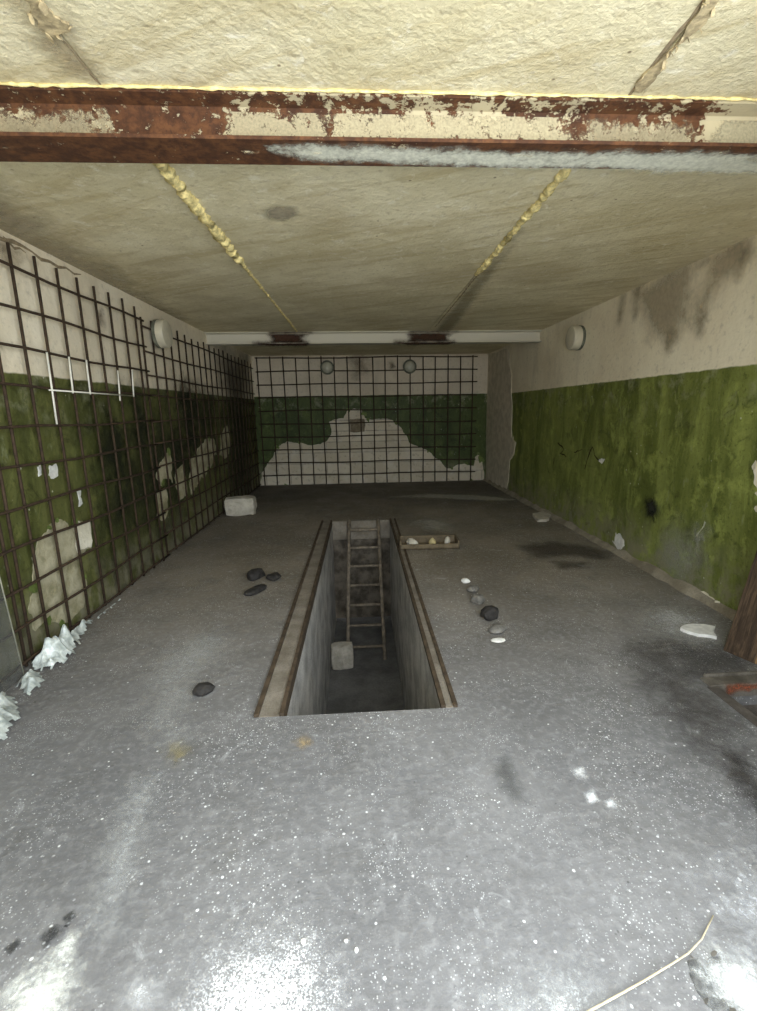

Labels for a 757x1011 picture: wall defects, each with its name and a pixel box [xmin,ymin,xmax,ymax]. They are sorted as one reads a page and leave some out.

crack [60,36,101,85]
crack [628,0,704,95]
water stain [643,276,685,343]
peeling [260,349,516,489]
peeling [156,426,230,521]